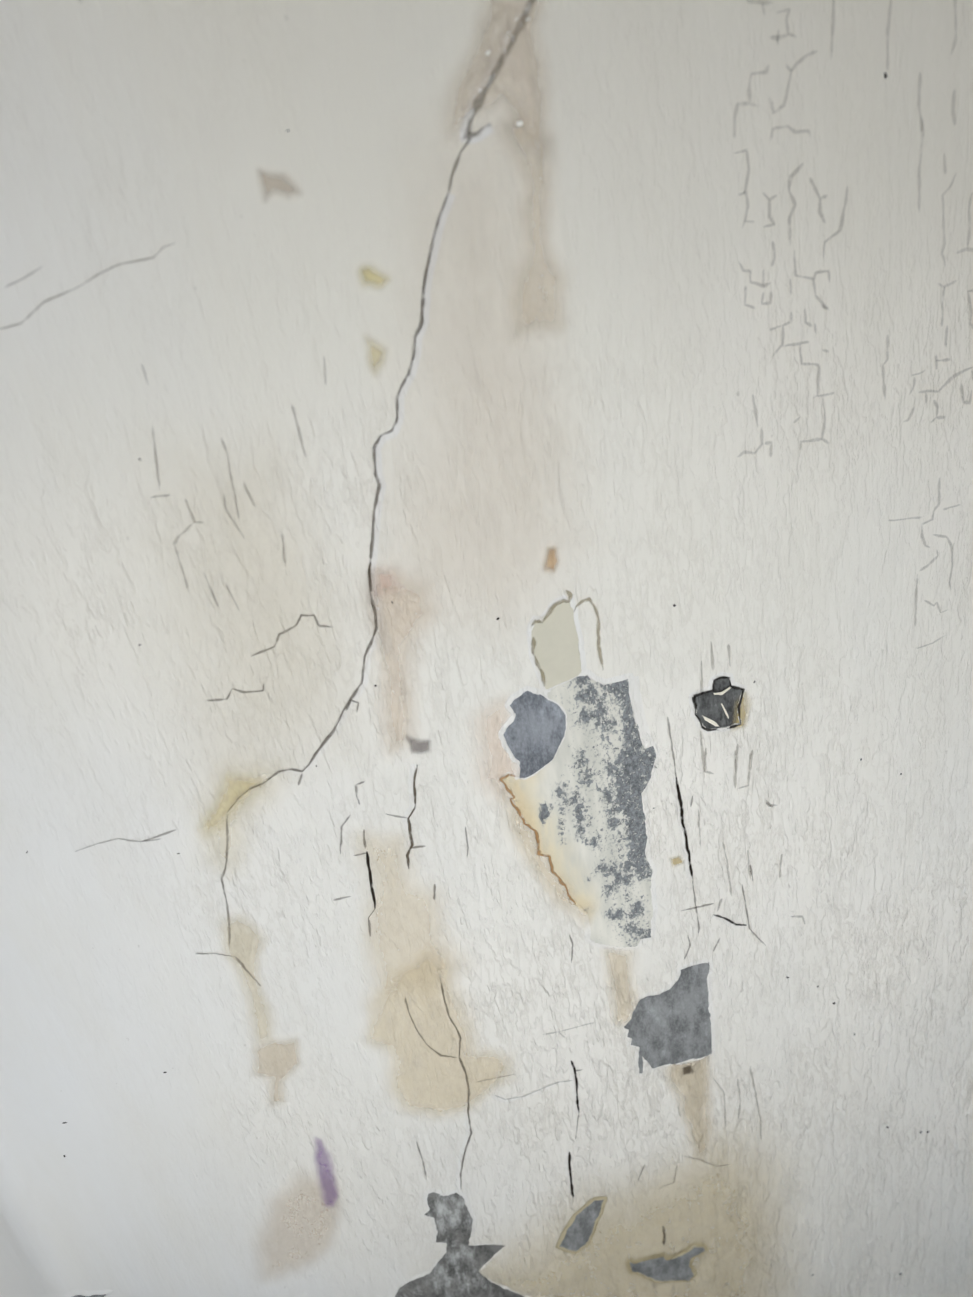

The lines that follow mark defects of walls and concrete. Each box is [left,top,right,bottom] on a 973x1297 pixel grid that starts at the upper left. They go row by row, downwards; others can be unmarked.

crack [460,0,533,144]
crack [226,192,456,815]
peeling [688,672,747,734]
crack [361,851,376,909]
crack [402,764,418,870]
peeling [496,591,660,951]
crack [671,777,693,879]
peeling [619,959,716,1076]
crack [434,974,579,1190]
peeling [391,1188,533,1297]
peeling [555,1196,607,1254]
peeling [626,1244,708,1283]